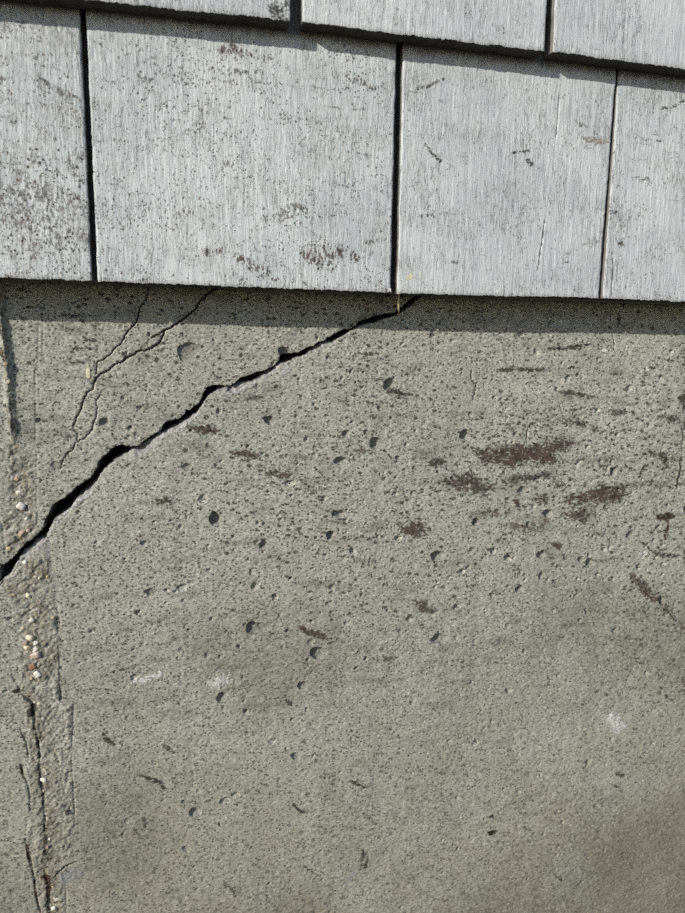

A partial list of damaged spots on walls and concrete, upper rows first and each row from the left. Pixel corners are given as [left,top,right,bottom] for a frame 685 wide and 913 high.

crack [0,287,422,597]